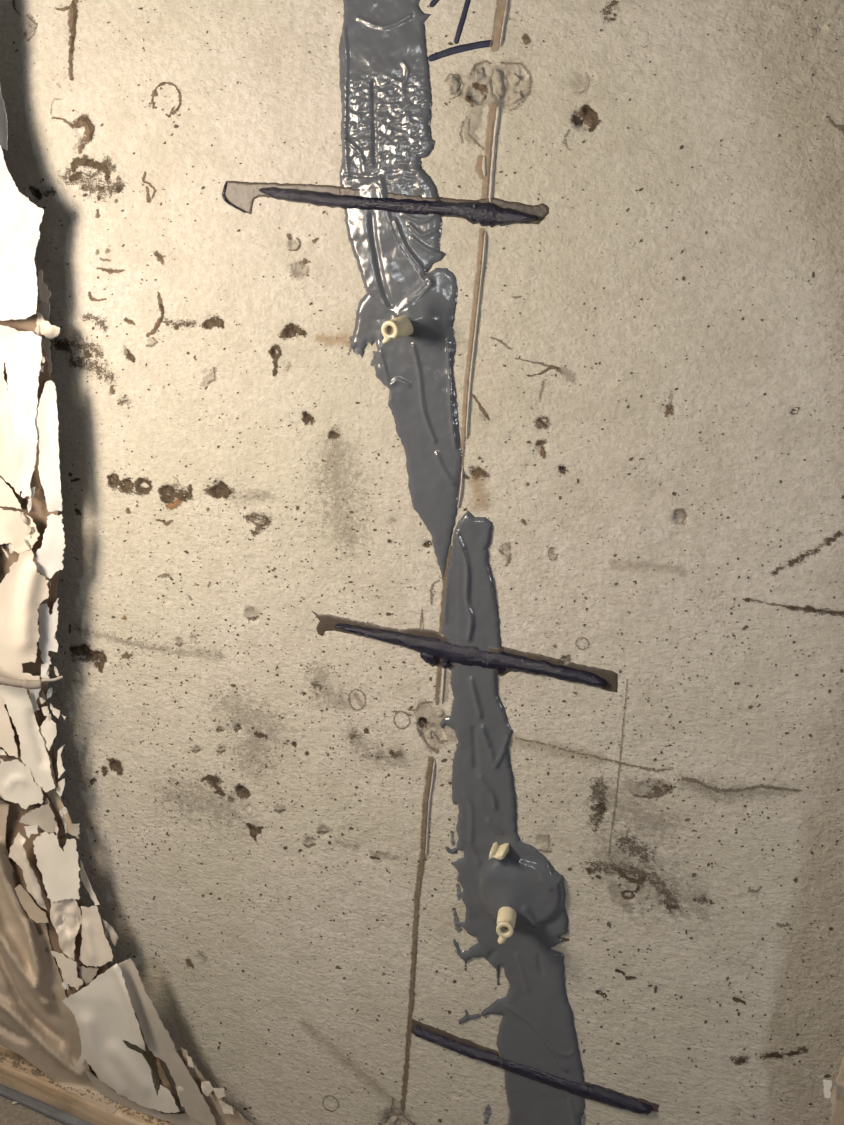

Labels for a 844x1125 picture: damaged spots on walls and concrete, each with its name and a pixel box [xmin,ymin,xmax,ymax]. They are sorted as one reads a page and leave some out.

peeling [200,367,216,387]
crack [490,336,575,402]
crack [745,598,844,617]
crack [515,679,802,856]